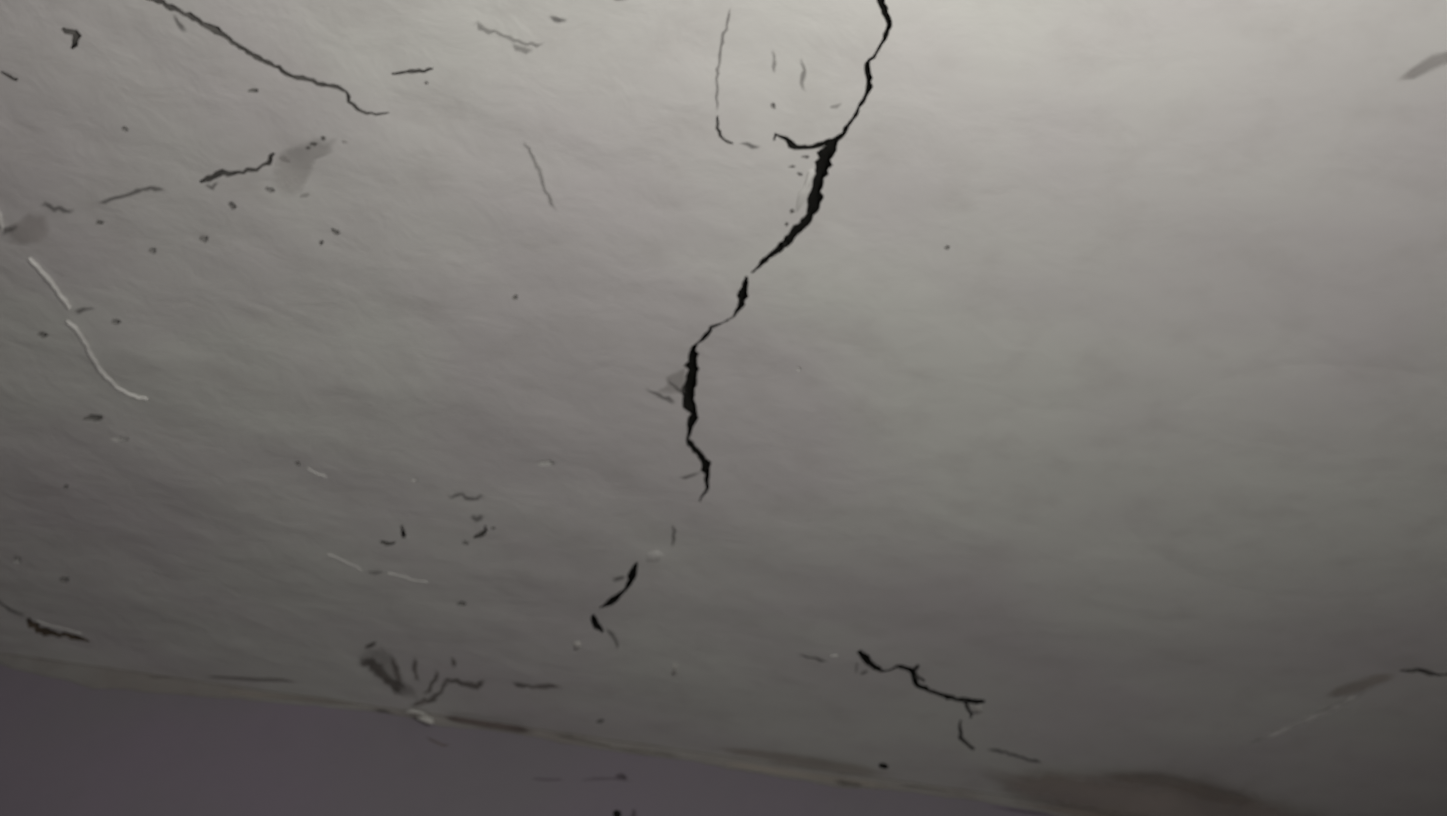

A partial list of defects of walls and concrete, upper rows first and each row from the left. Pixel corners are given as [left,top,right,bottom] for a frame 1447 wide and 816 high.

crack [149,0,389,116]
crack [391,68,433,85]
crack [199,152,275,193]
crack [46,204,70,212]
crack [103,187,161,203]
crack [652,0,892,502]
crack [591,527,676,646]
crack [0,602,90,642]
crack [1400,668,1447,676]
crack [802,650,1038,762]